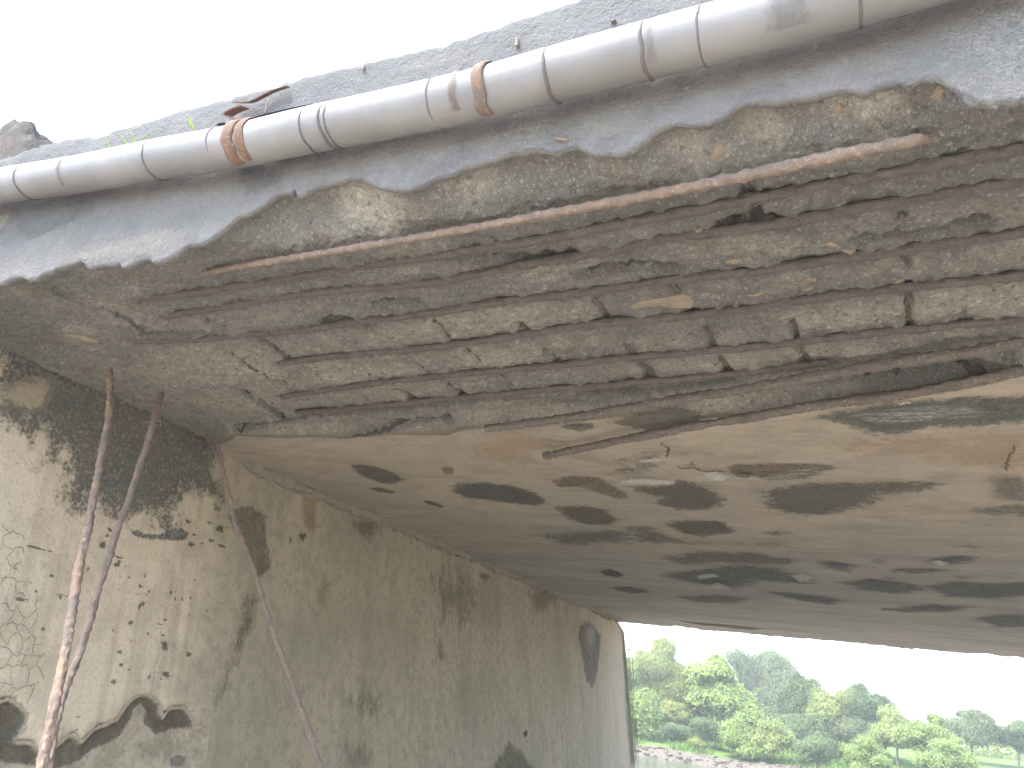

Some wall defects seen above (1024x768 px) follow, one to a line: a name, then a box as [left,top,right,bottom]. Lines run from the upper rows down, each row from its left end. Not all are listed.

spalling [0,84,1024,449]
water stain [0,347,226,561]
water stain [351,465,404,493]
water stain [442,468,545,506]
water stain [981,478,1024,516]
water stain [231,507,270,576]
water stain [544,458,942,605]
water stain [823,547,1024,613]
crack [0,524,68,704]
water stain [579,623,600,687]
water stain [685,622,759,630]
water stain [978,615,1024,628]